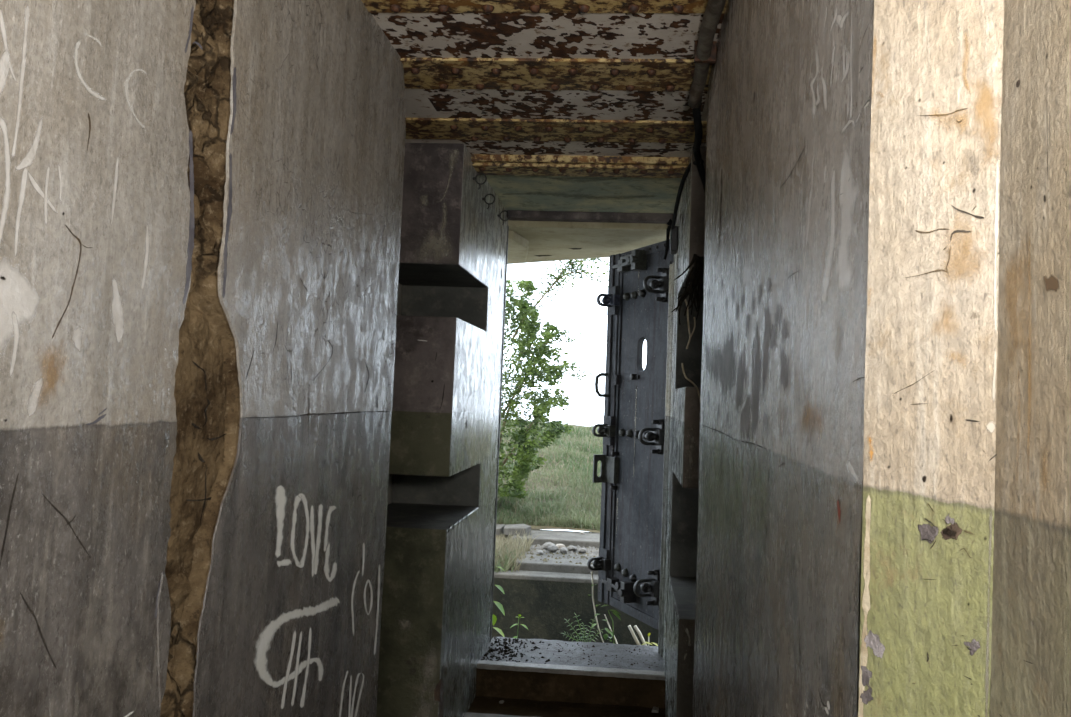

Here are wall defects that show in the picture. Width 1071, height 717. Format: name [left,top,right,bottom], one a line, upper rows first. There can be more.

peeling [371,13,704,59]
peeling [424,89,708,121]
peeling [459,140,694,157]
crack [155,0,389,717]
spalling [918,503,992,578]
peeling [858,495,885,717]